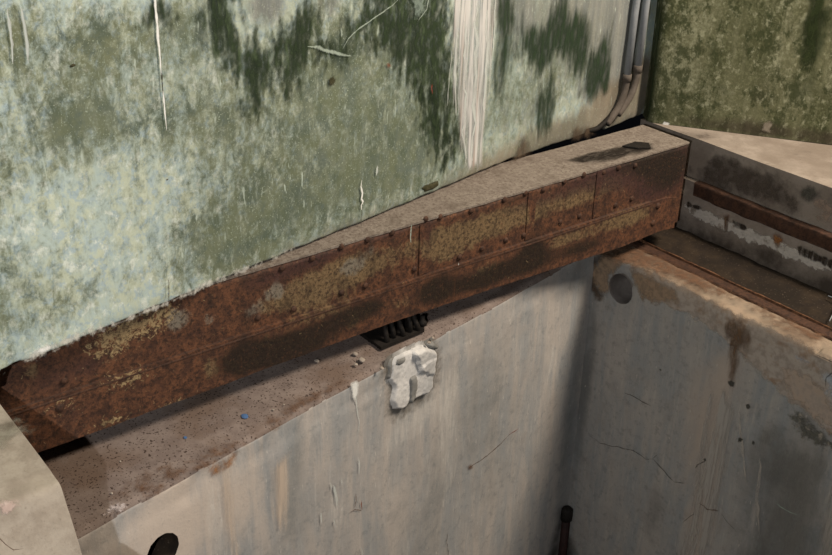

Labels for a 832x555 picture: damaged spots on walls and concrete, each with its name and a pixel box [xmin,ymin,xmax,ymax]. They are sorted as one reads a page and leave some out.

water stain [21,9,29,60]
water stain [143,0,179,25]
water stain [275,0,331,100]
water stain [447,0,496,167]
water stain [414,82,448,171]
rust [622,141,651,149]
rust [693,181,832,253]
rust [606,246,725,294]
rust [725,323,750,378]
water stain [390,385,422,414]
spalling [30,226,832,555]